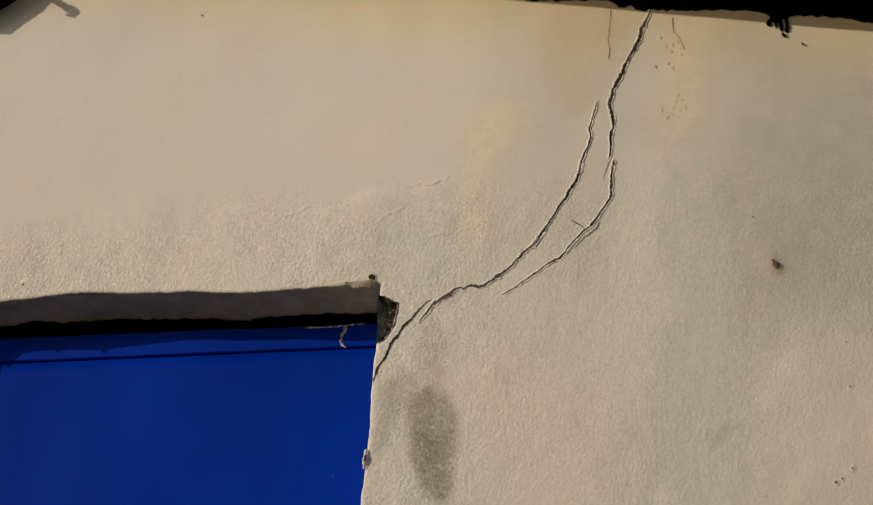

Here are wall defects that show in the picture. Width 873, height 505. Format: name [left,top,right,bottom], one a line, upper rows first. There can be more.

spalling [343,272,399,343]
crack [373,9,682,383]